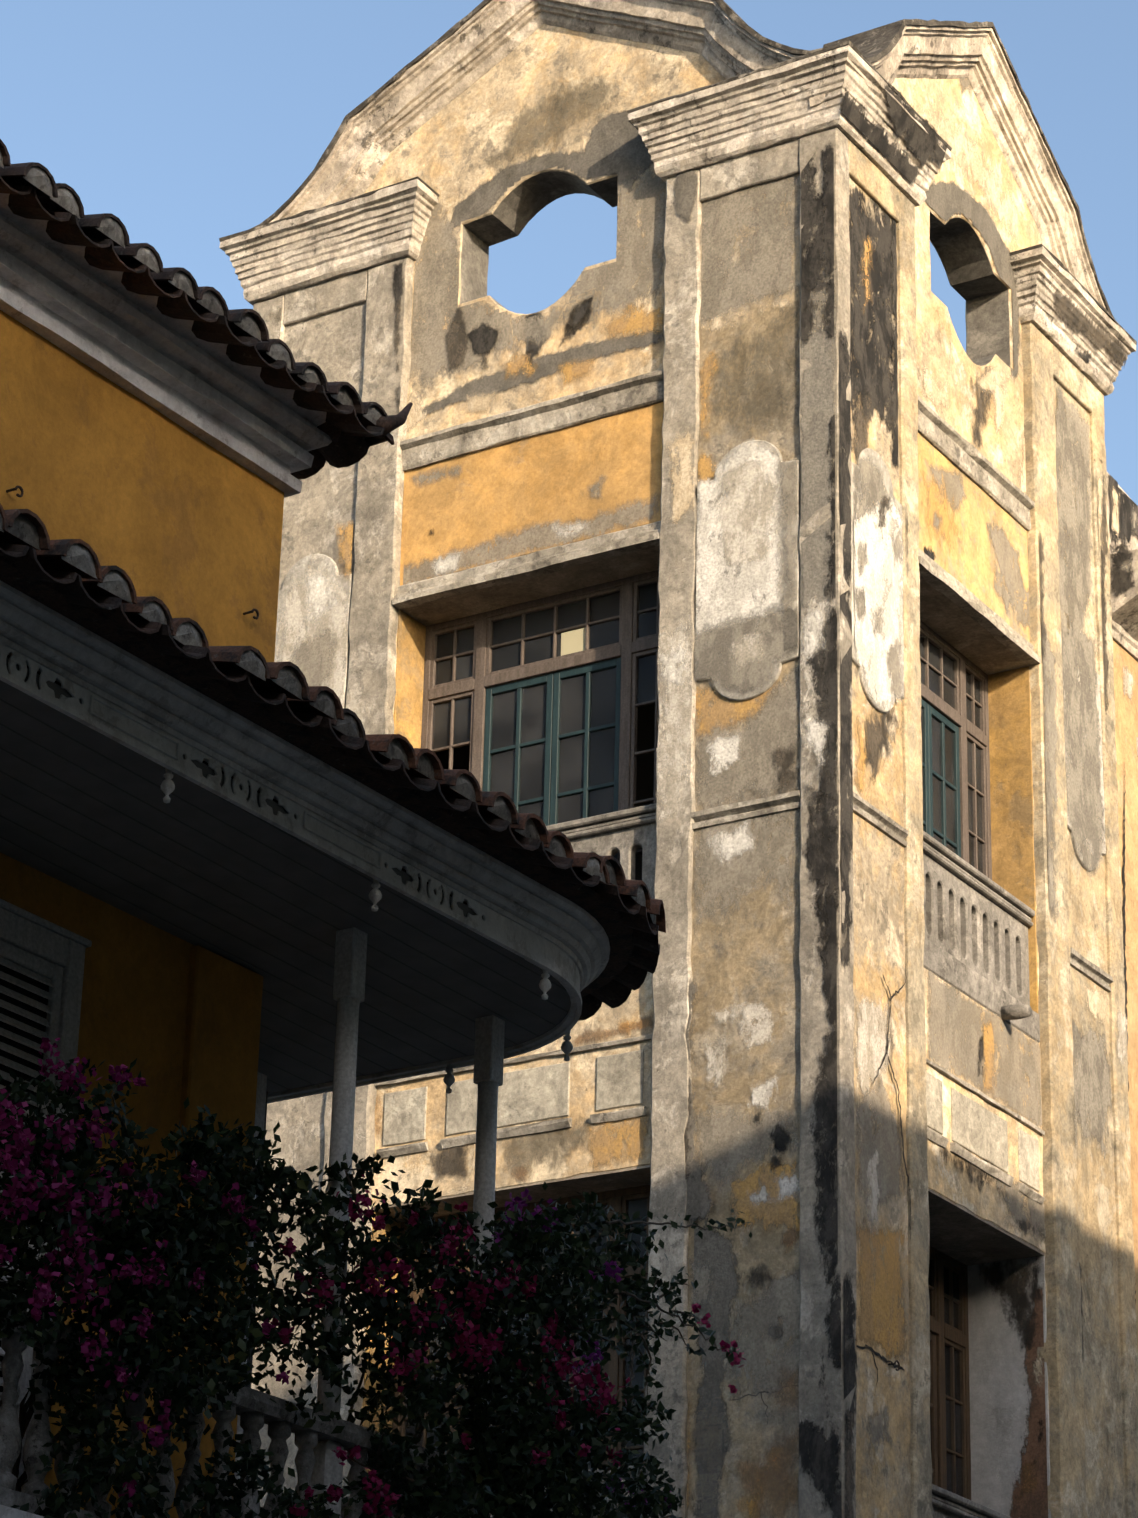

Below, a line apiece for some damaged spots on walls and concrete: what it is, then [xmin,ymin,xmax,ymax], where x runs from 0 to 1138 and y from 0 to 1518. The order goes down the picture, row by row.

water stain [446,308,498,370]
water stain [526,297,593,373]
peeling [403,351,839,820]
peeling [854,501,904,709]
peeling [1080,612,1096,651]
water stain [694,143,899,1518]
water stain [684,978,713,1225]
crack [866,961,911,1239]
spalling [1010,1287,1048,1518]